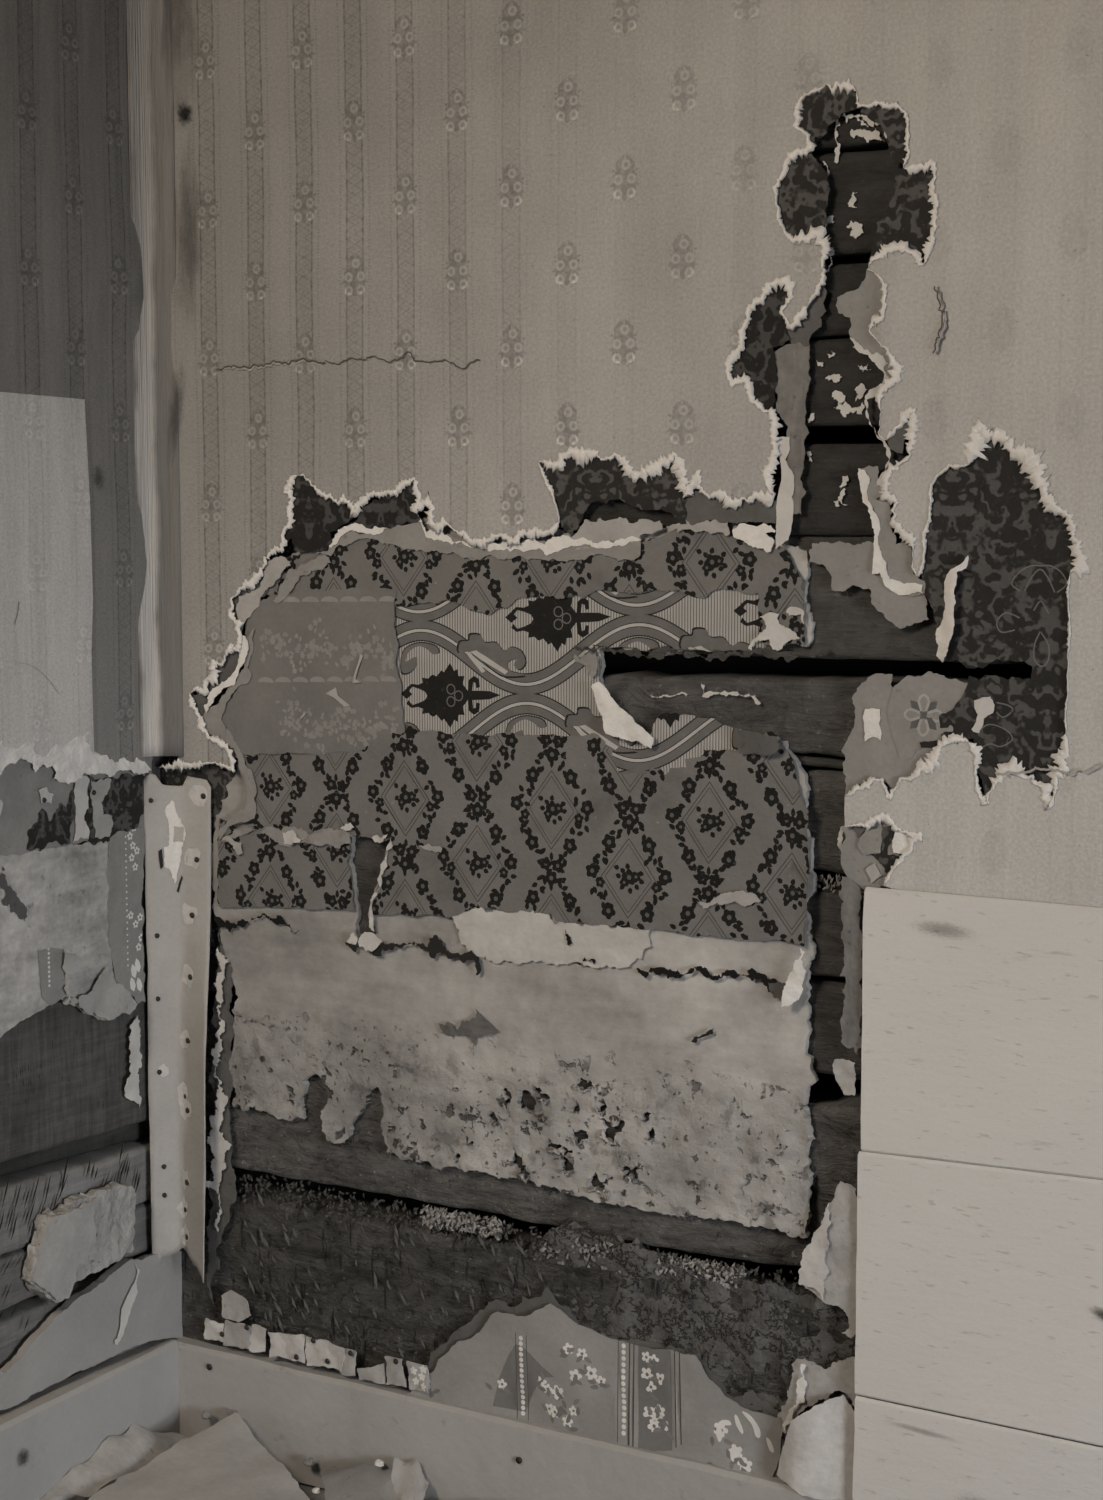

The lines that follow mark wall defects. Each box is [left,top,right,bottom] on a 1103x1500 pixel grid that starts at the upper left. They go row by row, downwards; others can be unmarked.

crack [216,351,480,372]
peeling [0,76,1090,1056]
peeling [62,951,142,1107]
peeling [206,930,237,1306]
hole [489,1087,550,1128]
hole [514,1153,531,1184]
hole [543,1078,655,1176]
hole [586,1166,638,1201]